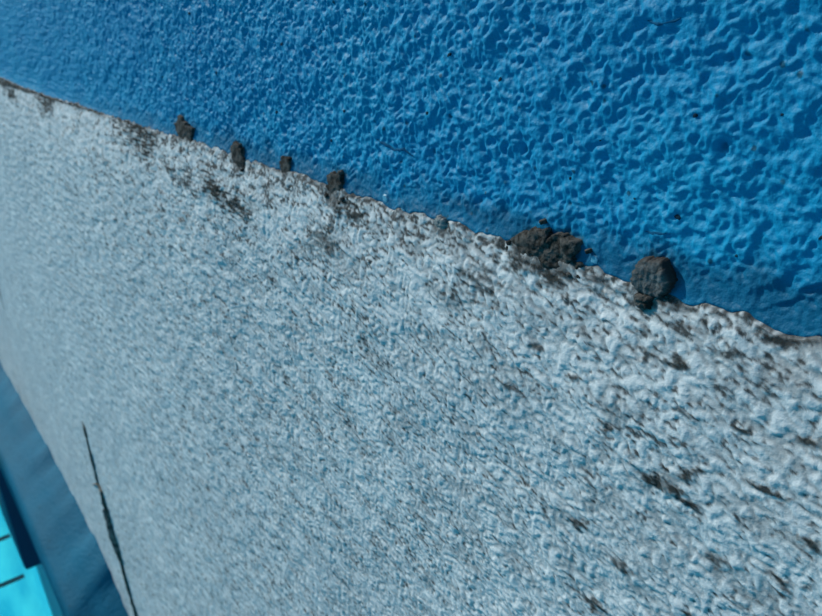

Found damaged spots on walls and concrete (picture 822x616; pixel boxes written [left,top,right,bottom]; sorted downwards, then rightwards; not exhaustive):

damp [0,78,104,118]
damp [112,120,158,165]
damp [163,160,252,229]
damp [333,201,369,227]
damp [311,227,338,256]
damp [459,268,501,293]
damp [638,346,689,370]
damp [642,467,704,522]
damp [746,480,790,500]
crack [81,421,138,616]
damp [797,536,819,554]
damp [578,596,607,614]